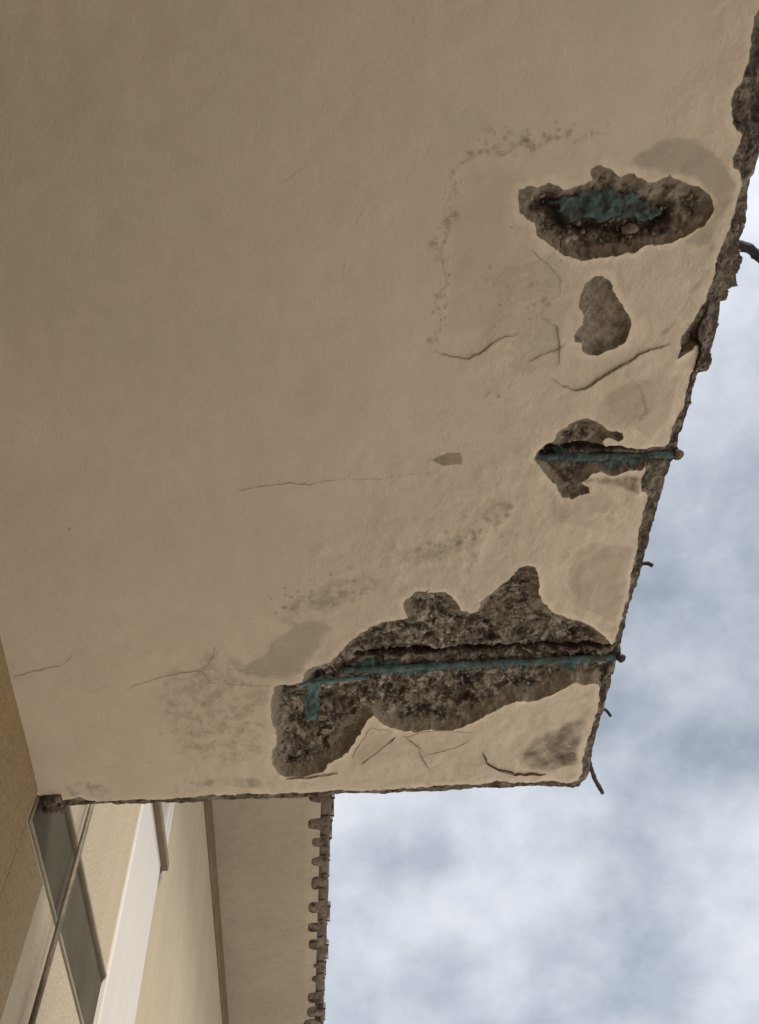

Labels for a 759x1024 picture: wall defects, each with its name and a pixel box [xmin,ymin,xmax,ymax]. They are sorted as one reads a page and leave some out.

spalling [39,11,759,814]
crack [437,336,514,359]
crack [529,249,666,391]
crack [405,730,546,776]